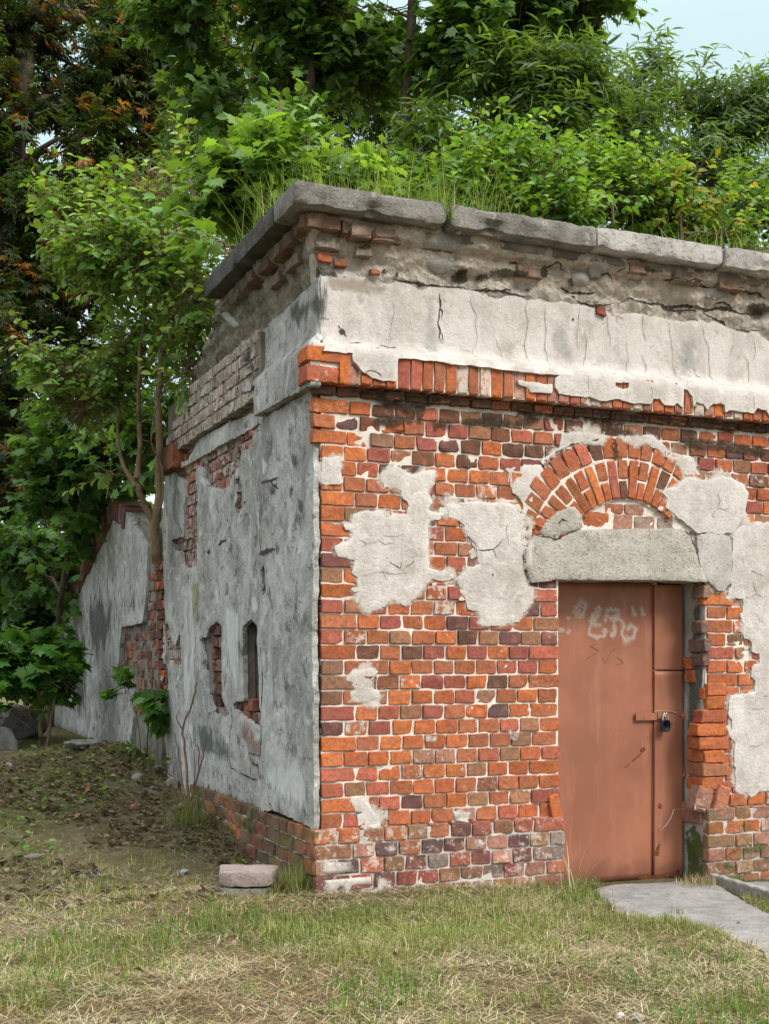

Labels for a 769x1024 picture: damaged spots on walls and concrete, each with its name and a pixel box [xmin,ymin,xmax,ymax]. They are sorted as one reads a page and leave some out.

crack [349,261,767,409]
spalling [173,416,267,568]
flaking render [317,453,344,487]
flaking render [334,426,769,797]
flaking render [350,797,388,830]